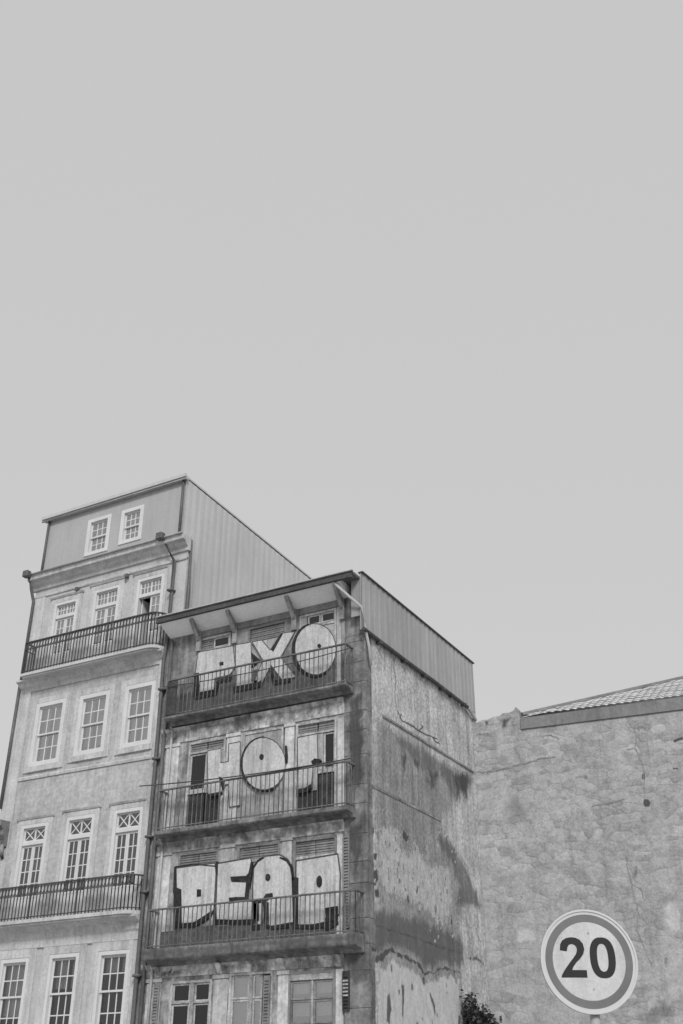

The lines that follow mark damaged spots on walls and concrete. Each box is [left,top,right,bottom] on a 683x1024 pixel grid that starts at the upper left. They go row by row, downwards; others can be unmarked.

crack [394,659,439,743]
leakage [402,742,469,794]
leakage [349,913,480,982]